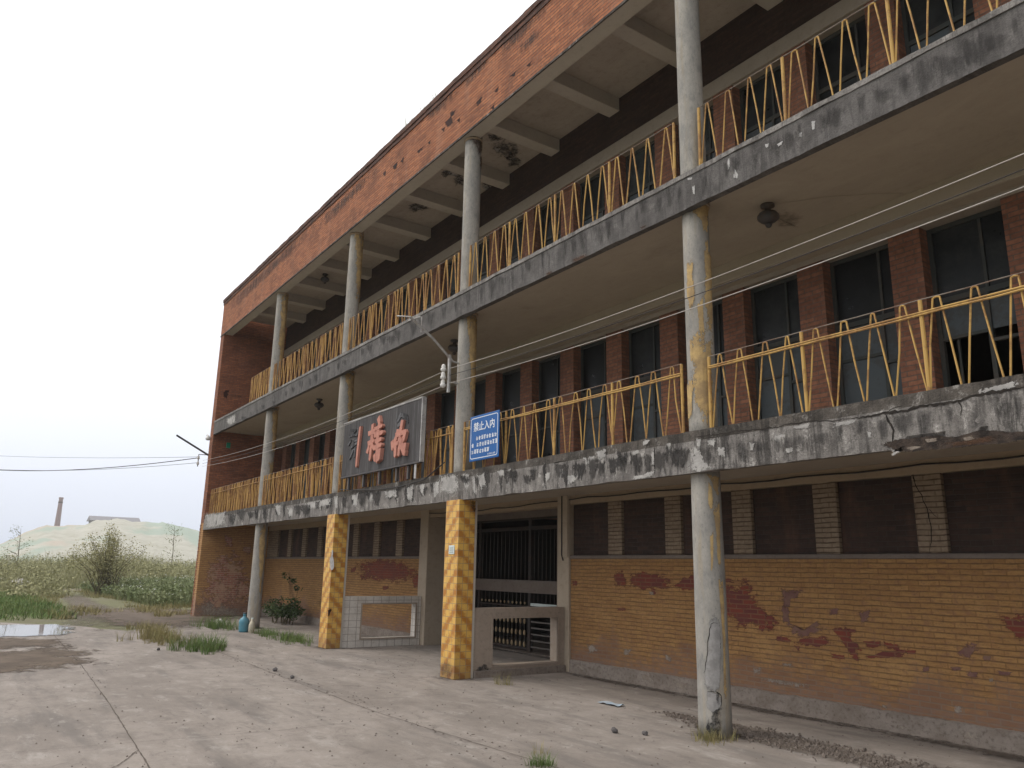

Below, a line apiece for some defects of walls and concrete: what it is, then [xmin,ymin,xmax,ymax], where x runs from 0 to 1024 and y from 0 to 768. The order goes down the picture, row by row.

damp [488,134,521,167]
peeling [687,205,714,426]
crack [692,387,1024,441]
peeling [774,424,809,453]
damp [461,446,690,492]
peeling [351,559,418,590]
peeling [614,571,694,594]
peeling [687,438,916,712]
crack [704,623,722,706]